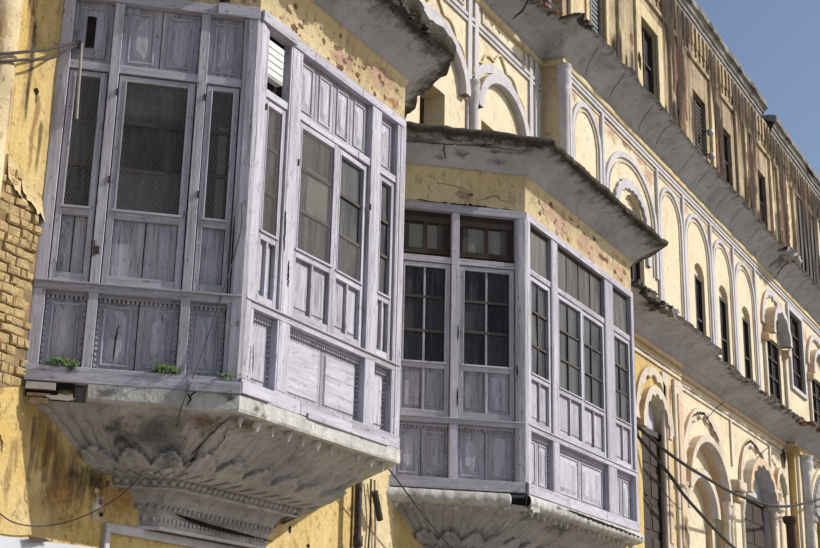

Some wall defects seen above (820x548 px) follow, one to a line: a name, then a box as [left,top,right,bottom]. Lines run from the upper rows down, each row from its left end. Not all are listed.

leakage [25,0,36,115]
crack [410,141,541,158]
leakage [662,0,696,147]
leakage [706,44,727,182]
leakage [732,80,820,285]
flaking render [0,154,75,406]
leakage [31,419,130,513]
crack [179,416,232,475]